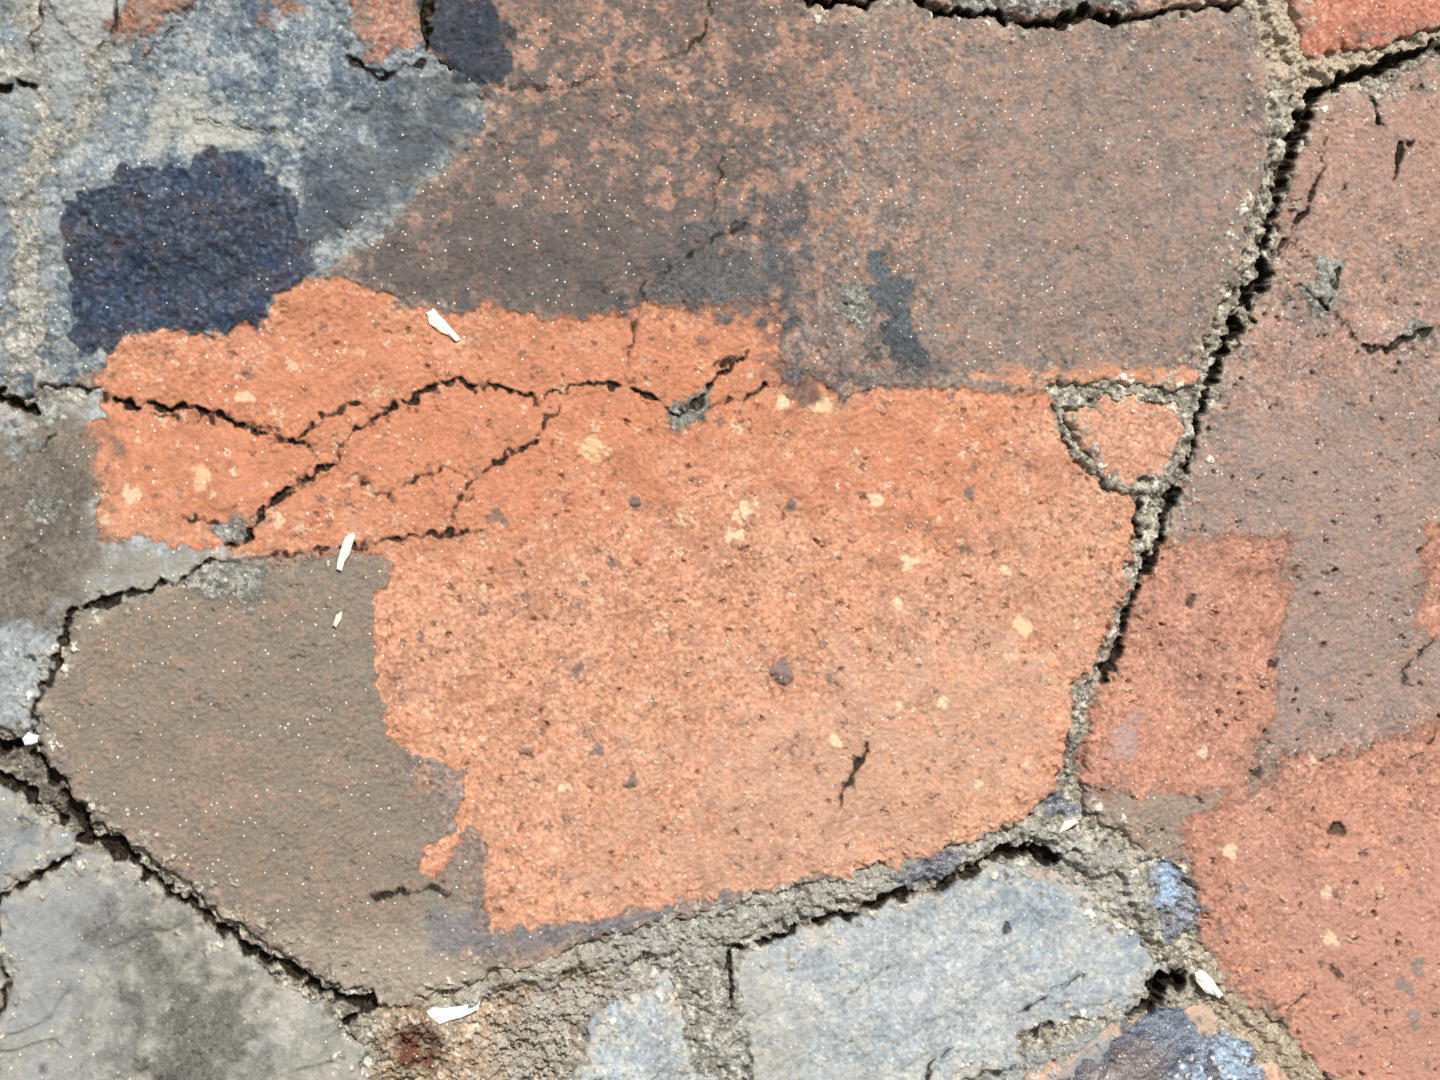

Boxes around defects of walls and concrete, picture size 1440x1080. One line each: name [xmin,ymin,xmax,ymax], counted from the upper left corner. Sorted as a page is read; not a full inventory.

crack [0,157,781,1025]
crack [1097,38,1440,685]